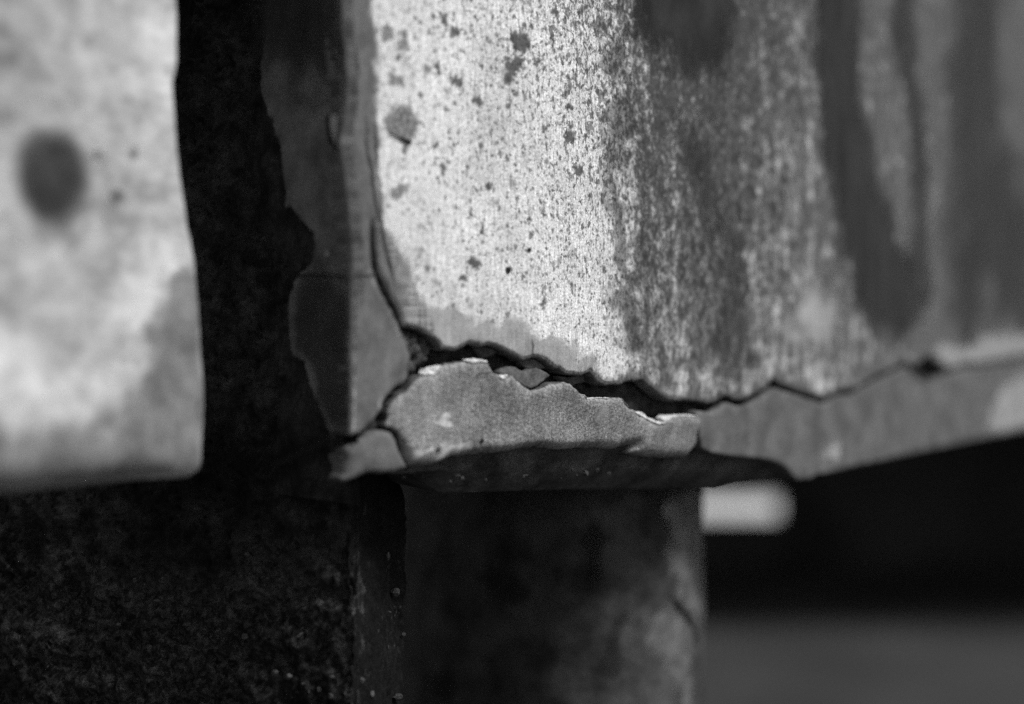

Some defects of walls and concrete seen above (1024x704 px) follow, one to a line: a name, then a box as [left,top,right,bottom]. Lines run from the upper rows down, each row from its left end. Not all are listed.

crack [389,329,847,419]
crack [875,356,1024,383]
crack [271,415,408,471]